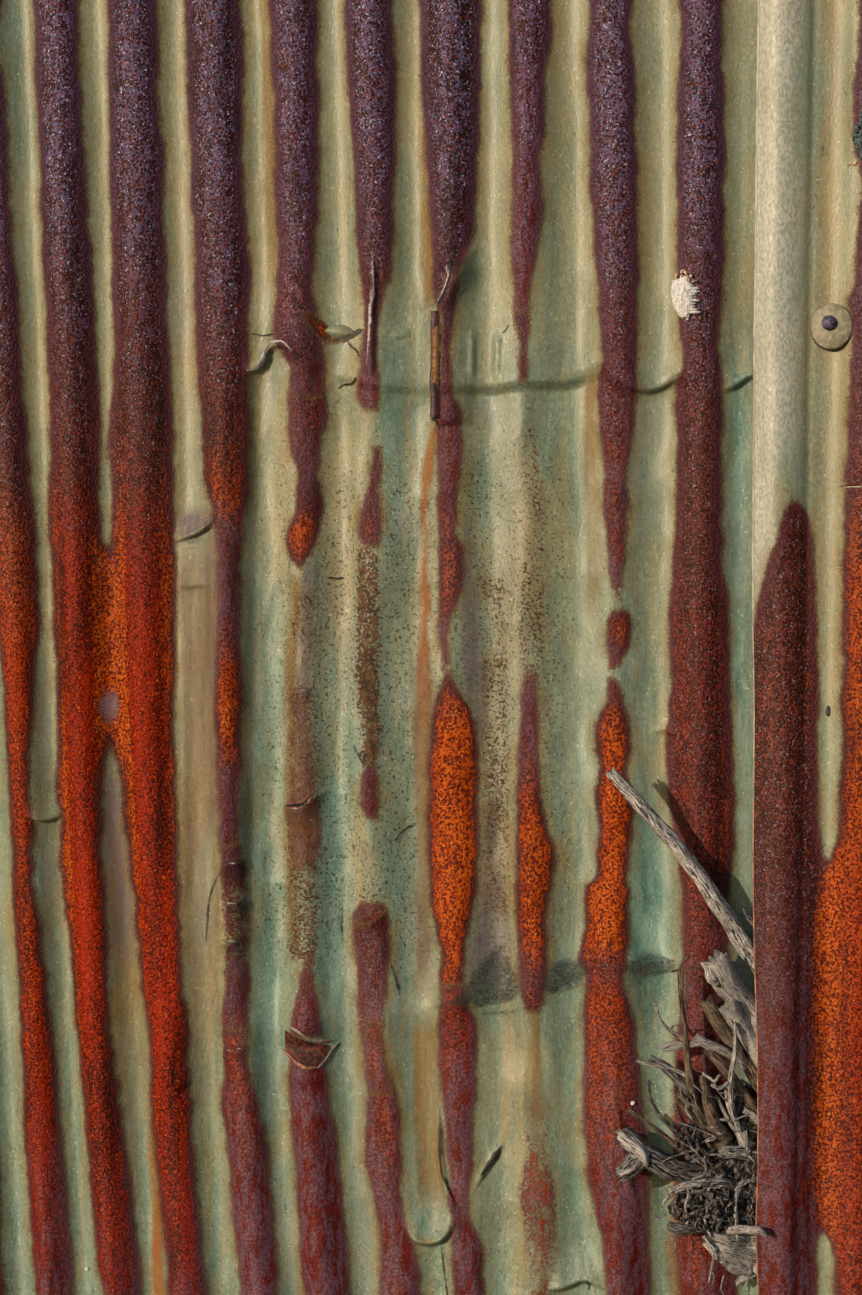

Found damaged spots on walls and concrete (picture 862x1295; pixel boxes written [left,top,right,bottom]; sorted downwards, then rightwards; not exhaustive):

corrosion [0,0,209,1295]
corrosion [182,0,356,1295]
corrosion [340,0,563,1295]
corrosion [577,0,654,1295]
corrosion [662,0,862,1295]